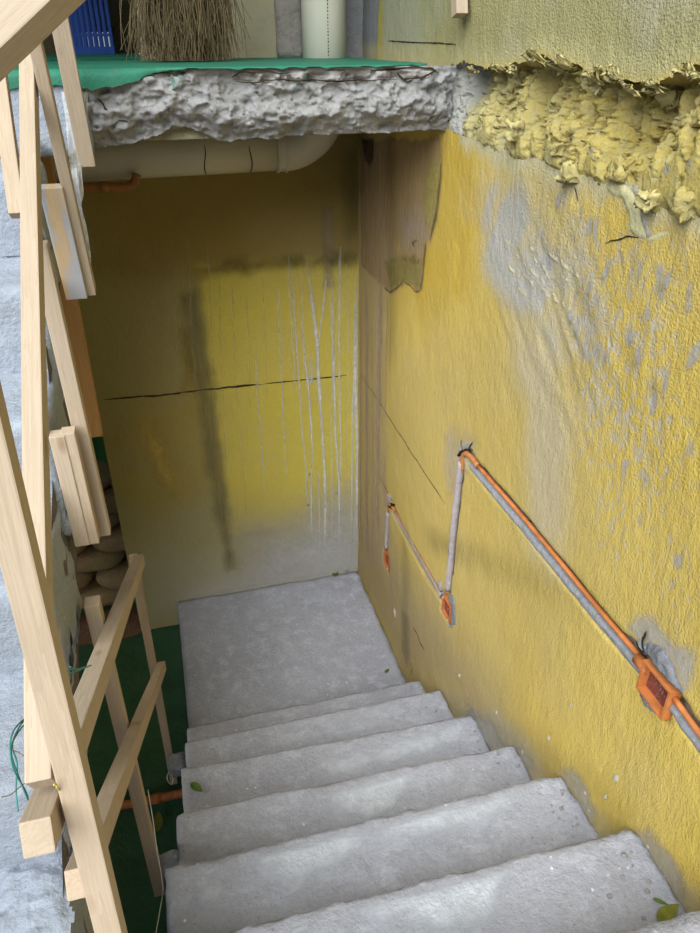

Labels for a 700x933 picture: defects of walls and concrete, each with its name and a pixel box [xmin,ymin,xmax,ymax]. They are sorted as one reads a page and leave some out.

crack [390,38,455,46]
spalling [83,47,700,293]
crack [106,375,444,502]
damp [284,282,381,562]